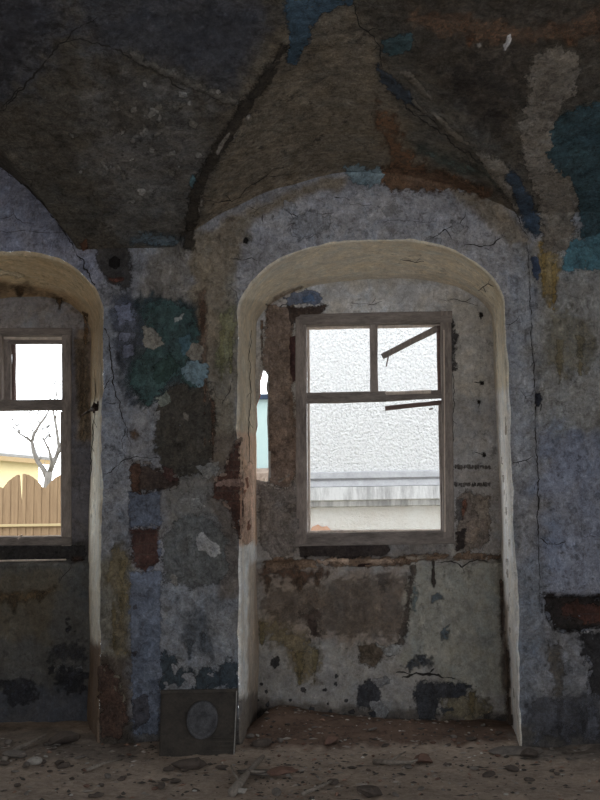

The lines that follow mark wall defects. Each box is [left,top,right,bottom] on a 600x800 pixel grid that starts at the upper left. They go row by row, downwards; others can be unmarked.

crack [1,18,130,111]
peeling [376,44,600,280]
crack [385,196,594,593]
peeling [80,239,508,740]
water stain [0,678,40,707]
water stain [46,618,89,696]
crack [396,668,455,679]
spalling [539,592,600,696]